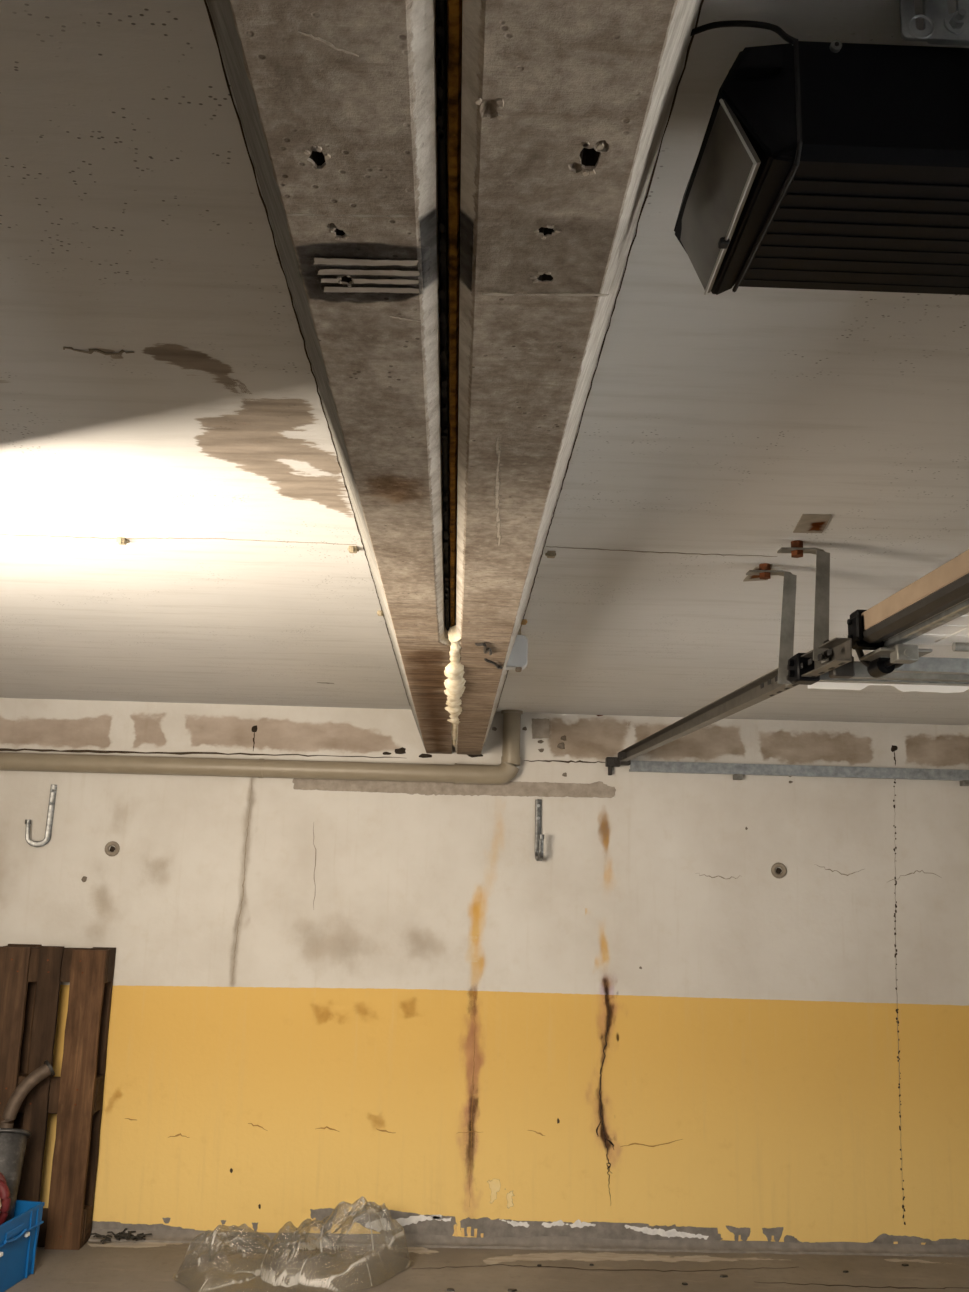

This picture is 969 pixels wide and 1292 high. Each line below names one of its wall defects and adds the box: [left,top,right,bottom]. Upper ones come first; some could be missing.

peeling [532,718,550,739]
crack [814,779,940,1225]
rust [458,1006,480,1207]
peeling [354,1210,819,1243]
peeling [868,1234,969,1245]